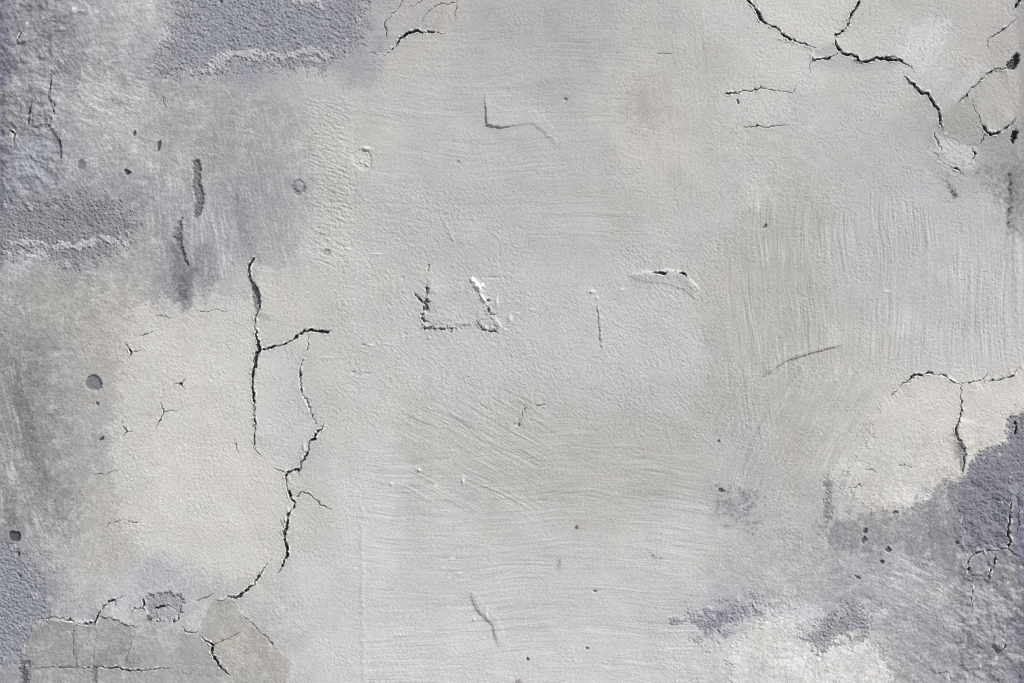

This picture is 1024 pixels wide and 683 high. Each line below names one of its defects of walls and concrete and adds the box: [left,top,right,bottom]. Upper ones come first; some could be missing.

spalling [146,0,375,84]
crack [370,0,457,54]
crack [725,85,793,96]
crack [747,0,1017,173]
spalling [0,189,143,277]
crack [890,371,1016,471]
crack [36,255,332,675]
spalling [820,474,836,524]
spalling [954,411,1024,557]
spalling [668,584,773,654]
spalling [796,592,882,656]